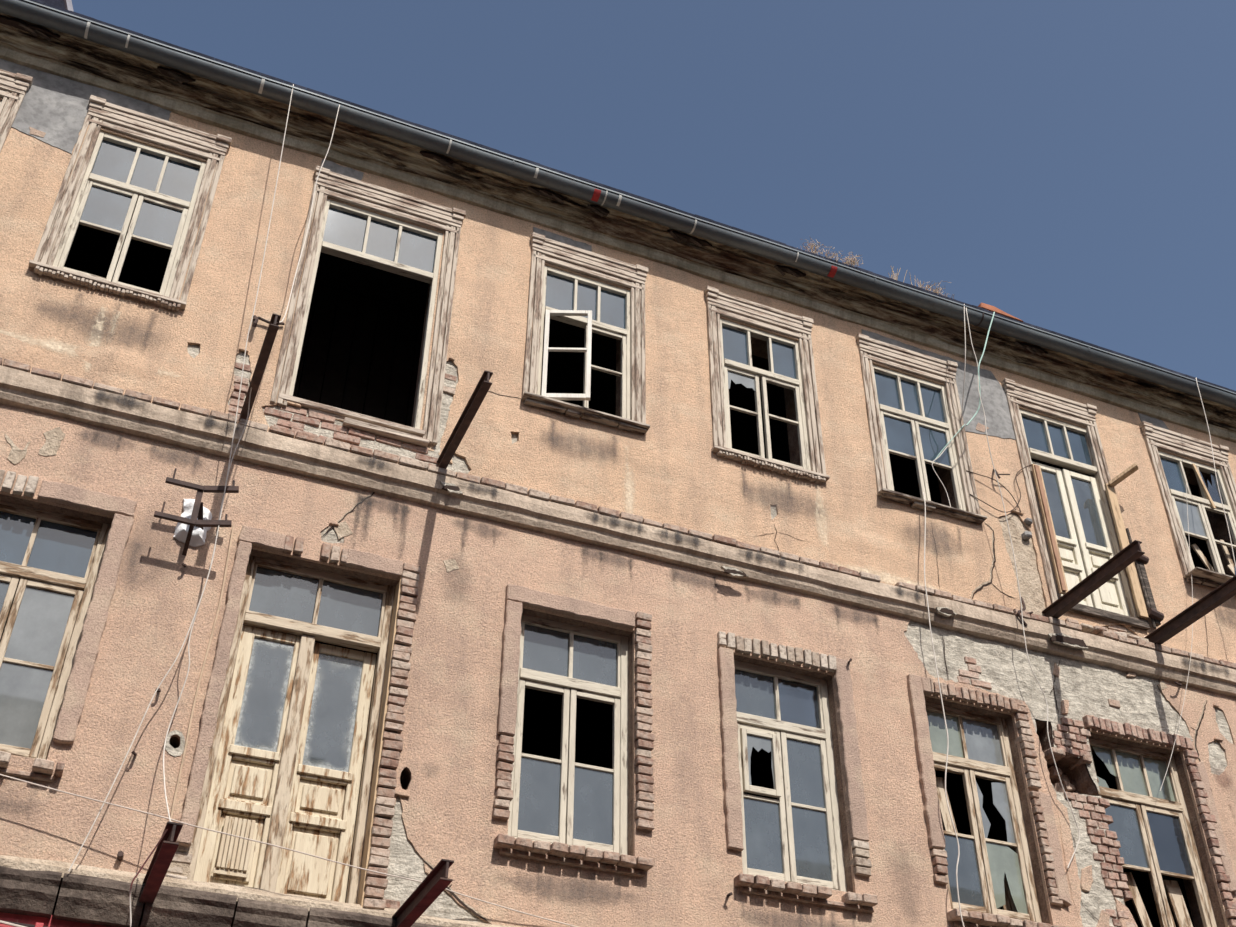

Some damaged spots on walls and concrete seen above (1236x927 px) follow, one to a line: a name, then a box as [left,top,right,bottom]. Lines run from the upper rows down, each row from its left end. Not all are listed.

damp [0,308,119,368]
flaking render [228,347,251,421]
peeling [5,427,66,465]
flaking render [262,356,471,492]
crack [321,492,375,538]
crack [970,523,1016,599]
flaking render [904,621,1193,927]
flaking render [1208,703,1233,776]